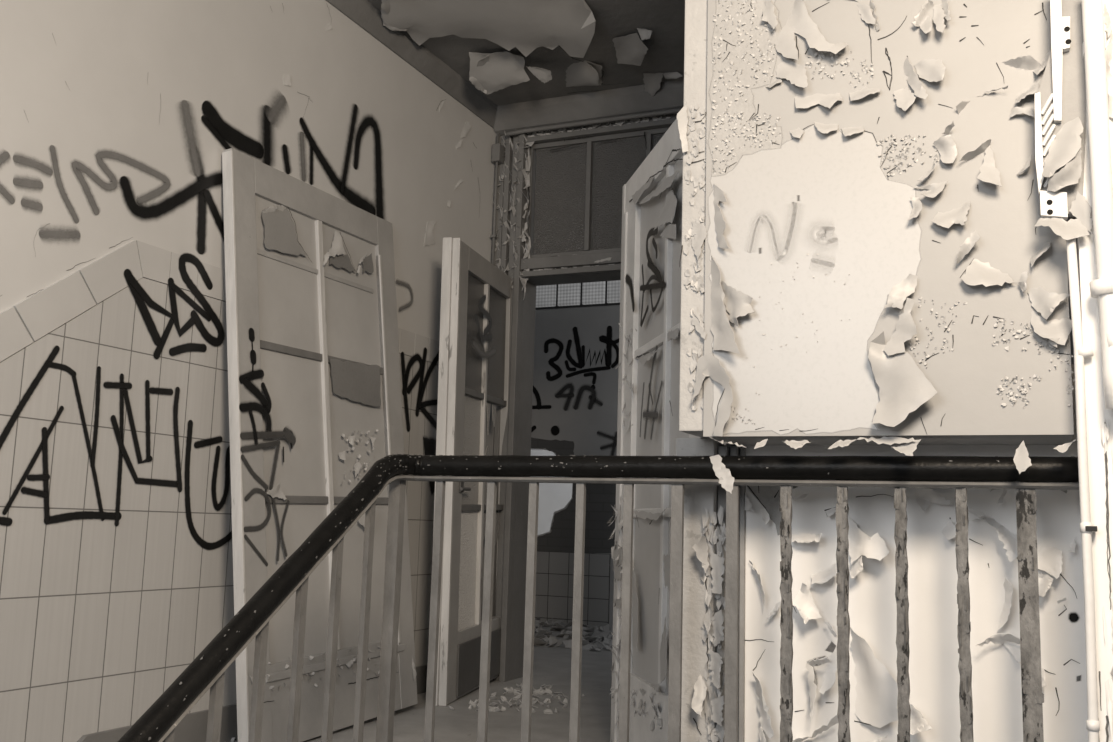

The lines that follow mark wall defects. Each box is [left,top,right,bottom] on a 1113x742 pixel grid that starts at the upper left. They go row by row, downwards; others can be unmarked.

peeling [381,0,619,94]
peeling [612,28,682,96]
peeling [761,0,984,109]
peeling [983,40,1051,117]
peeling [492,130,535,300]
peeling [629,101,1096,545]
flaking render [530,437,608,469]
flaking render [537,483,667,731]
peeling [691,505,726,742]
peeling [745,507,932,742]
peeling [975,578,1021,662]
peeling [1038,536,1079,622]